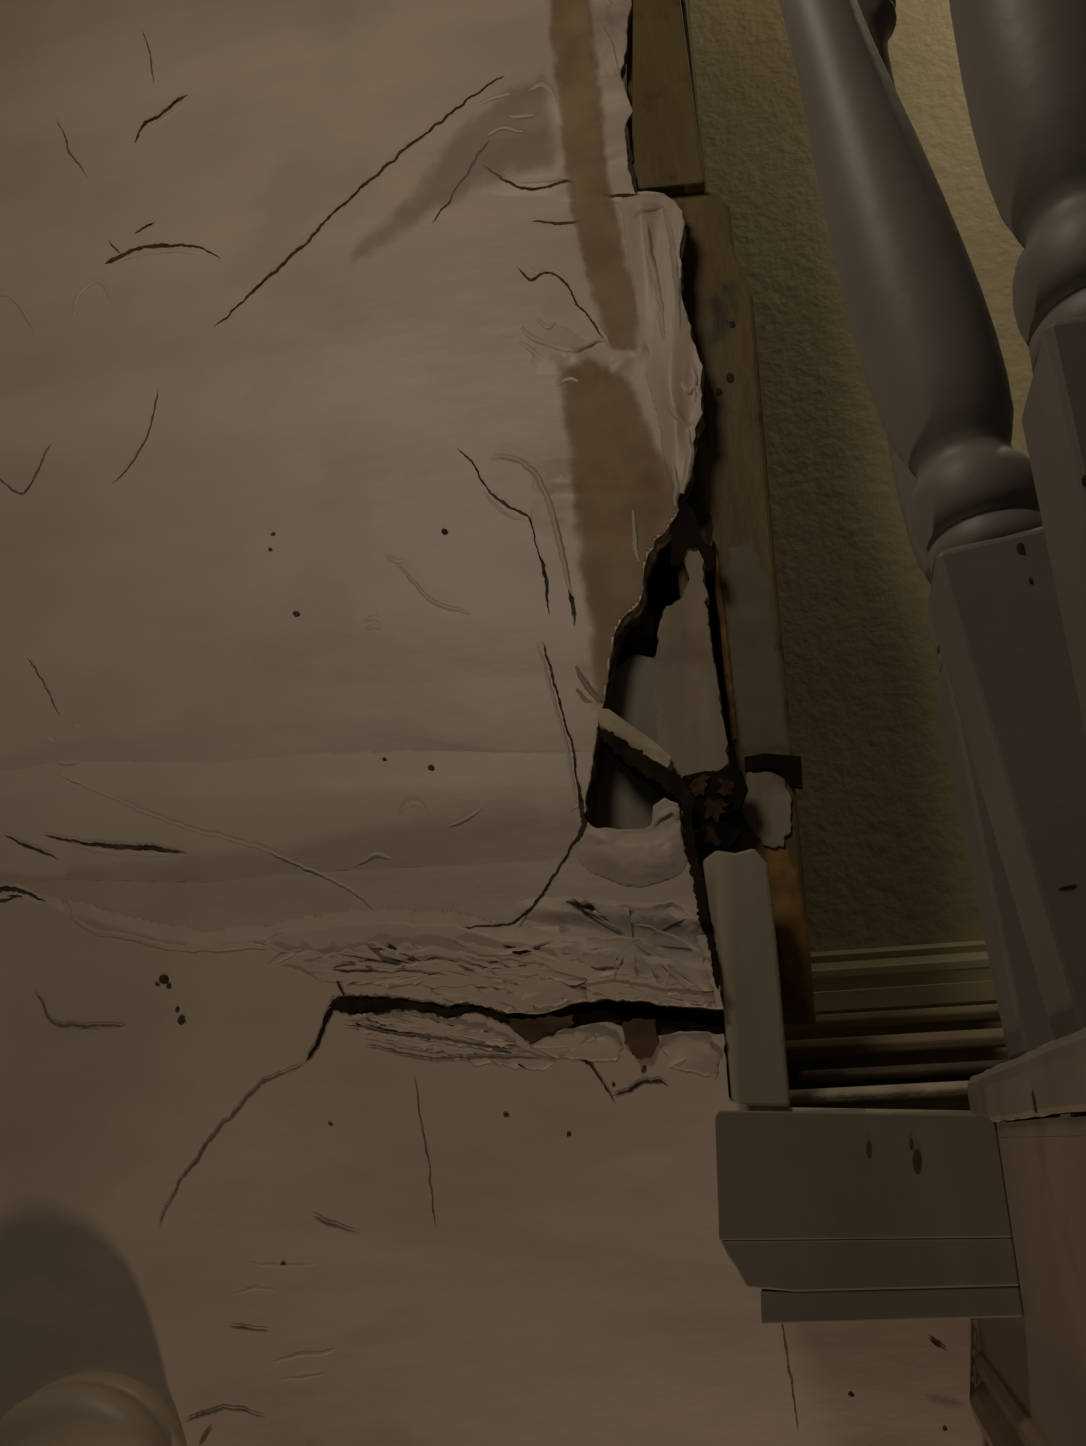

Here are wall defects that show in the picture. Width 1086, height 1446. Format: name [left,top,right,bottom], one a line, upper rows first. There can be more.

crack [217,74,505,324]
crack [432,139,576,225]
crack [609,125,638,197]
spalling [619,500,715,665]
crack [458,449,587,933]
crack [159,975,725,1226]
flaking render [344,1011,556,1070]